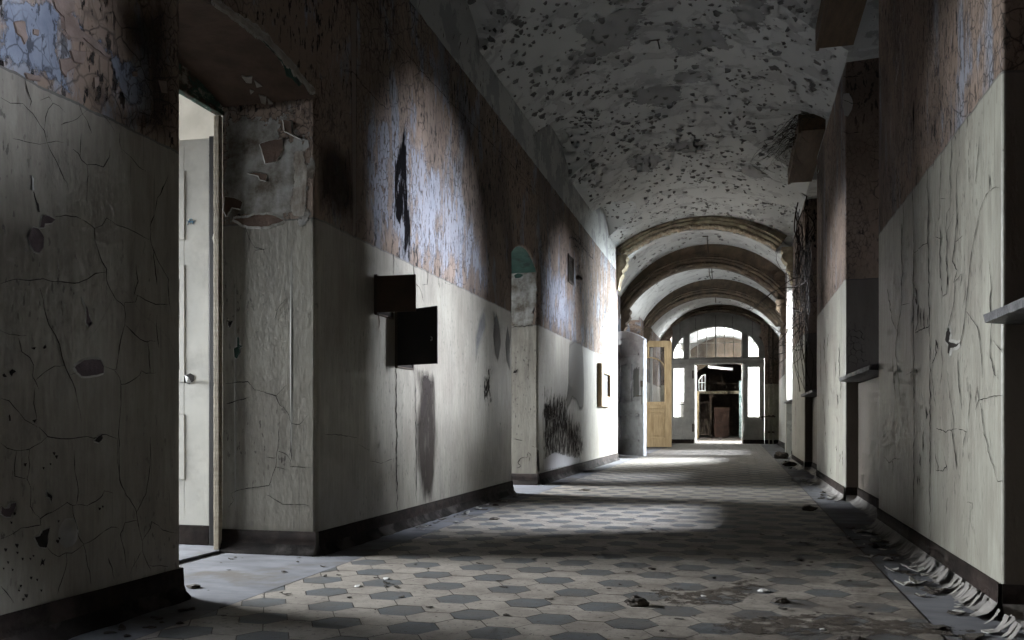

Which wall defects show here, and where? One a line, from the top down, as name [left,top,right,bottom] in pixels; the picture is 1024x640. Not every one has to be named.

peeling [0,0,143,105]
spalling [223,75,315,230]
leakage [394,129,410,258]
crack [1,81,173,591]
peeling [73,357,105,378]
crack [887,177,1004,482]
peeling [945,324,961,358]
leakage [418,371,435,498]